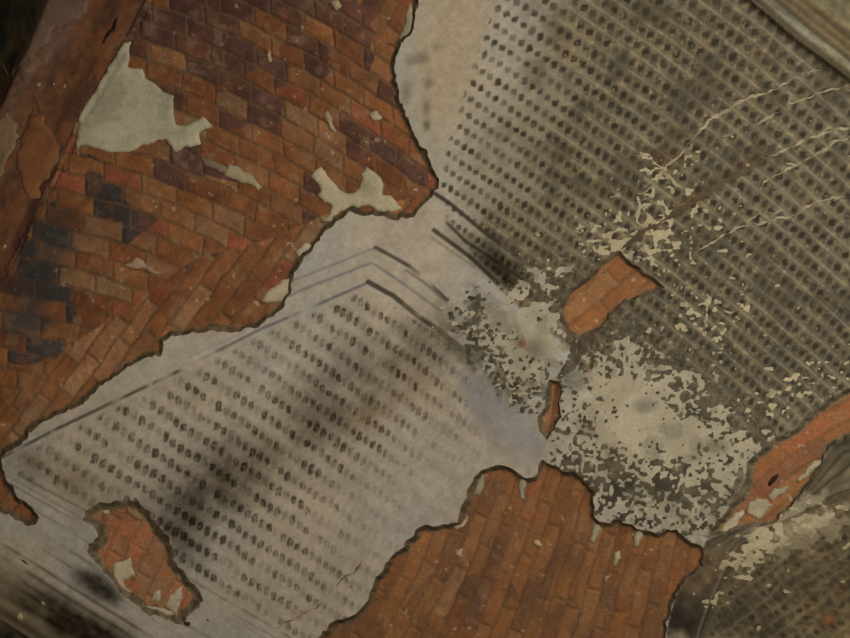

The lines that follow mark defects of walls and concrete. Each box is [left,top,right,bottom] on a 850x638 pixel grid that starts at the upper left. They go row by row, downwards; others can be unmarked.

crack [618,68,850,253]
spalling [0,0,439,526]
spalling [318,151,850,638]
water stain [47,598,115,638]
water stain [81,573,114,600]
spalling [83,498,203,628]